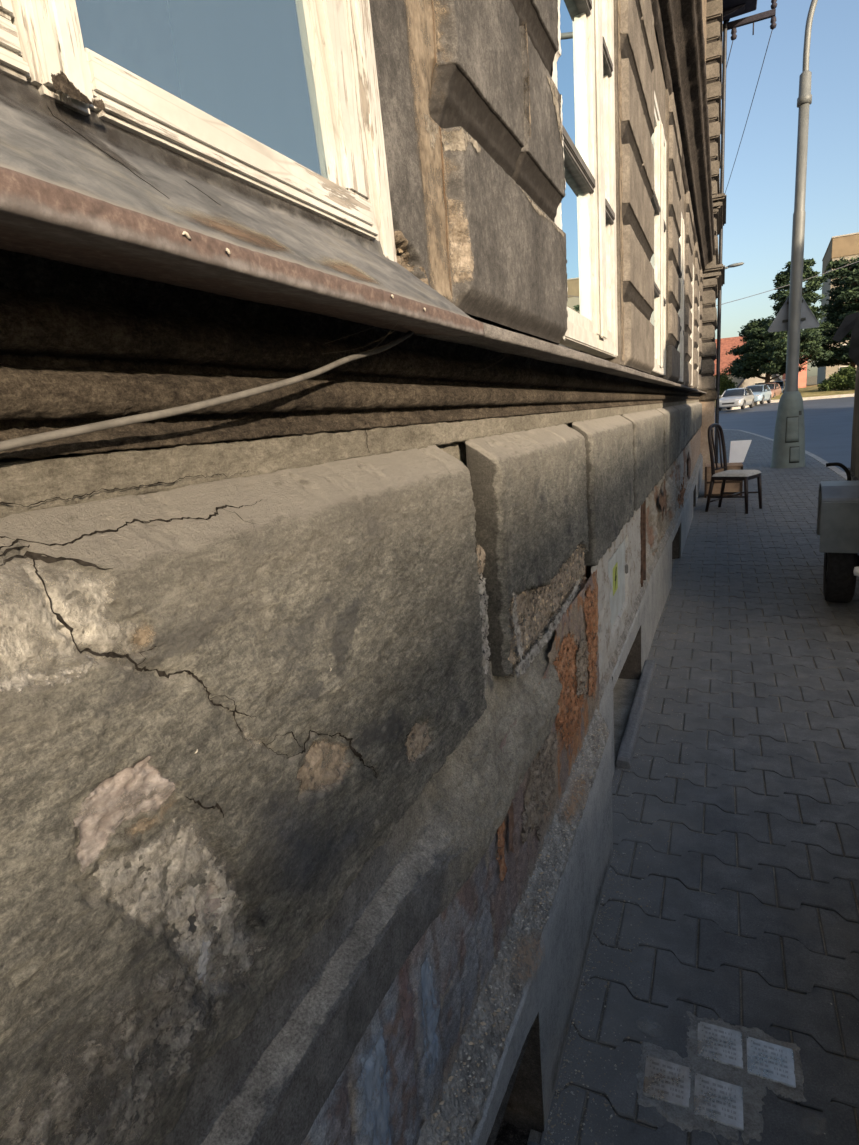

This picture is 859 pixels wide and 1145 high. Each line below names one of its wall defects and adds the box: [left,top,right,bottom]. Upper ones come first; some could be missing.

rust [196,217,285,250]
crack [0,470,249,507]
crack [0,500,377,779]
peeling [476,544,491,688]
spalling [505,544,588,678]
spalling [297,739,350,791]
spalling [405,722,431,762]
spalling [0,755,267,1145]